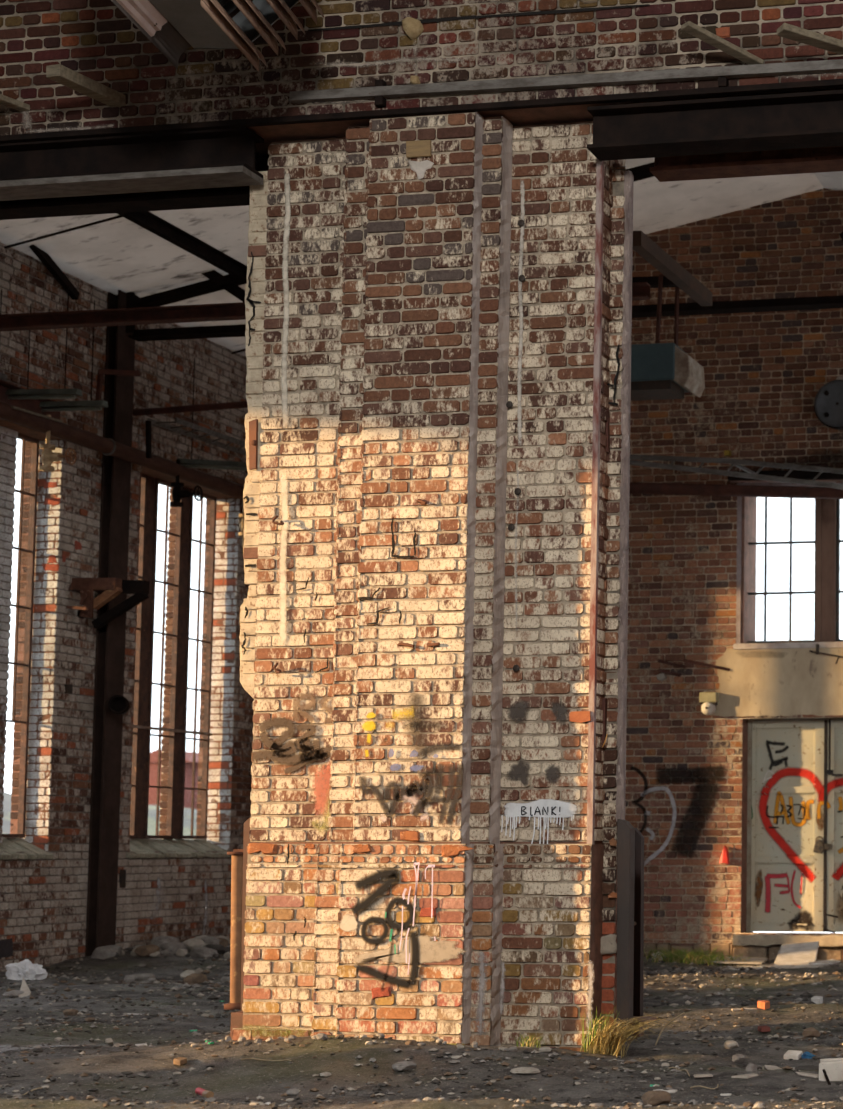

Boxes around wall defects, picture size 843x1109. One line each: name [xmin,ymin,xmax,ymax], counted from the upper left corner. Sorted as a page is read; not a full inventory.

crack [246,252,261,346]